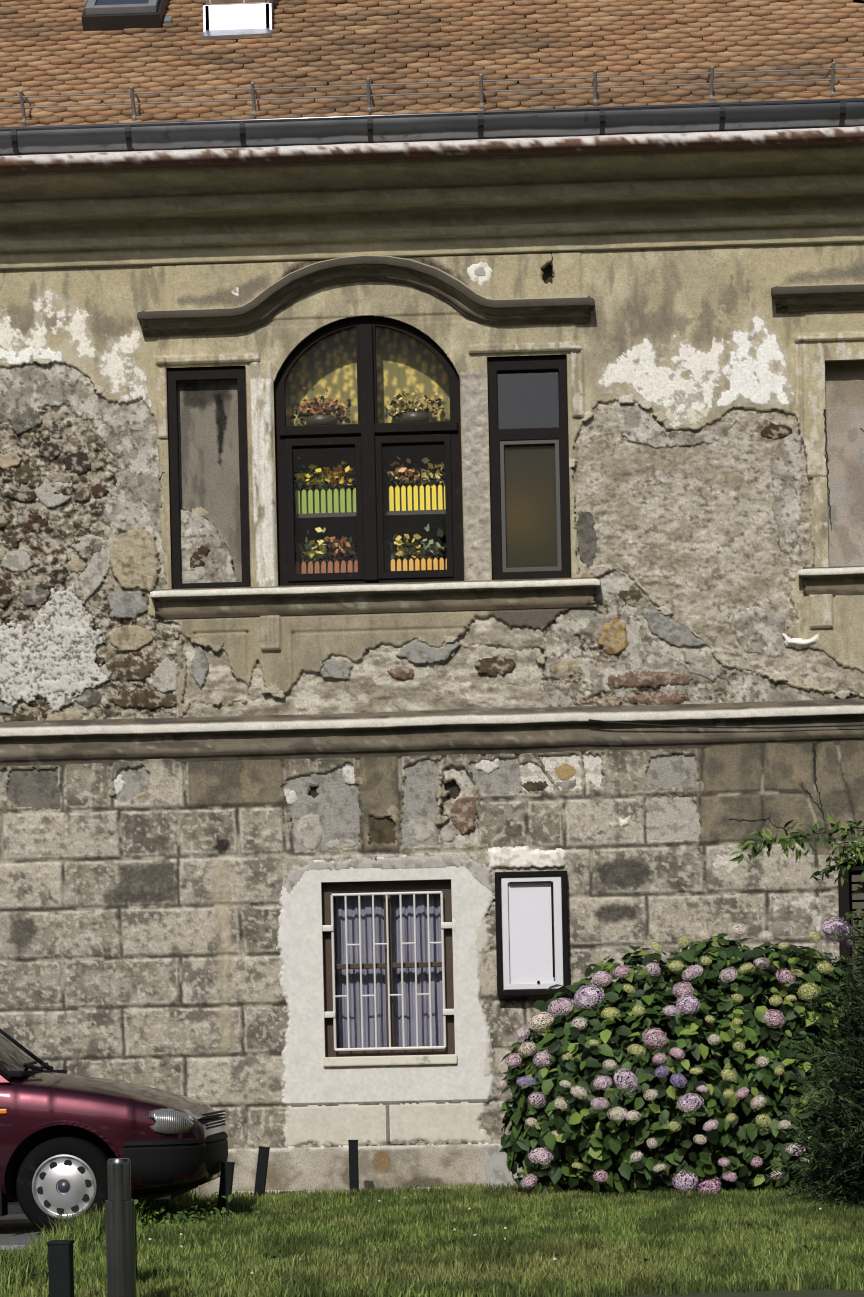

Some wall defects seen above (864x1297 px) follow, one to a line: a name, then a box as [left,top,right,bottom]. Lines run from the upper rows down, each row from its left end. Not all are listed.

spalling [0,289,864,722]
spalling [282,753,604,852]